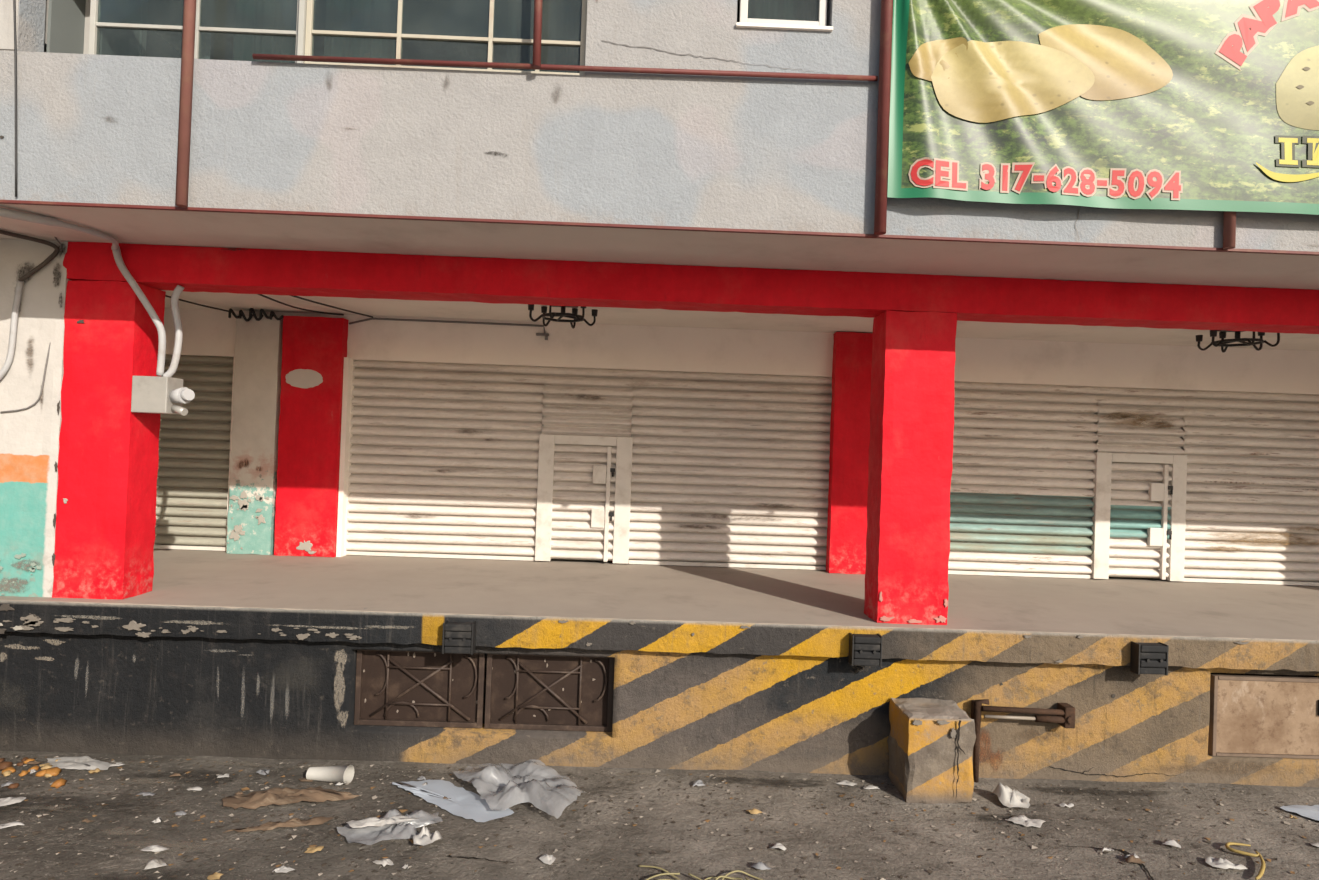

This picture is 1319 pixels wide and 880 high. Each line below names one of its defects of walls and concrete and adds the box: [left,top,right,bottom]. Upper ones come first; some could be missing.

peeling [227,474,269,549]
spalling [0,553,226,662]
flaking render [258,625,408,726]
crack [956,720,966,797]
corrosion [971,699,1076,783]
crack [1049,766,1178,778]